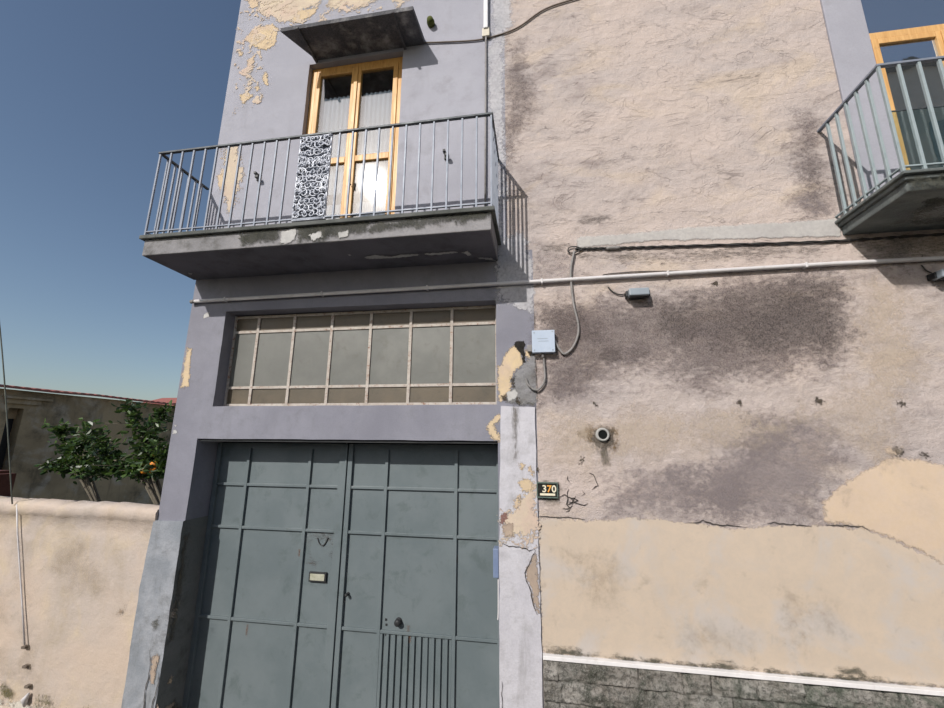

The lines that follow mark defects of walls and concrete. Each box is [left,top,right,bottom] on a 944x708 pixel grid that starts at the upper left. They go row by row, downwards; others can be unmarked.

peeling [234,0,409,114]
peeling [487,0,512,239]
peeling [280,228,296,244]
flaking render [496,341,537,405]
water stain [536,270,914,403]
peeling [486,414,501,443]
water stain [609,413,847,517]
peeling [497,462,542,614]
crack [772,522,868,530]